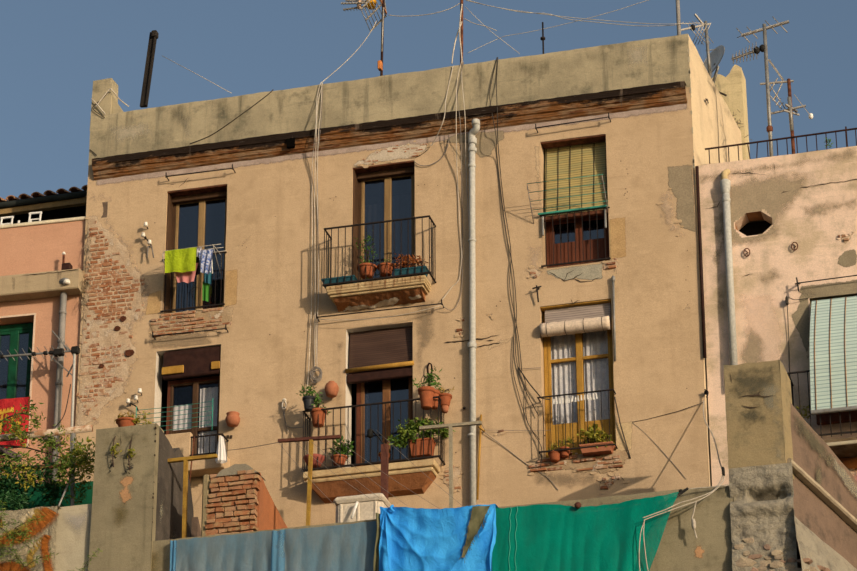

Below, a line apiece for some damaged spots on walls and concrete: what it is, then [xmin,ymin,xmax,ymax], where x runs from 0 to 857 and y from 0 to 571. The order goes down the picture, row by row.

spalling [354,140,430,168]
spalling [76,216,234,426]
spalling [528,450,629,490]